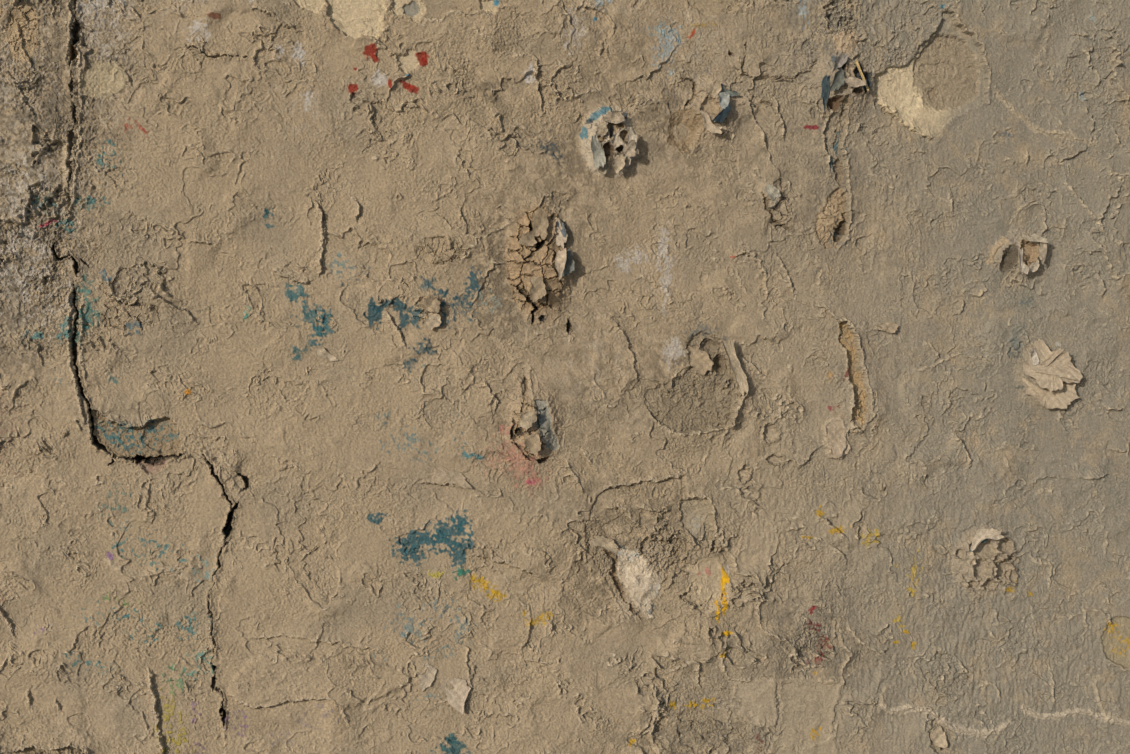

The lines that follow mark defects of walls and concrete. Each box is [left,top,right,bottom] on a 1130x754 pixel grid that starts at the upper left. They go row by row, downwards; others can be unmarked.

spalling [874,0,1009,143]
spalling [812,111,863,258]
spalling [88,393,182,475]
crack [51,0,250,727]
spalling [814,290,898,436]
spalling [563,320,861,754]
spalling [0,669,165,754]